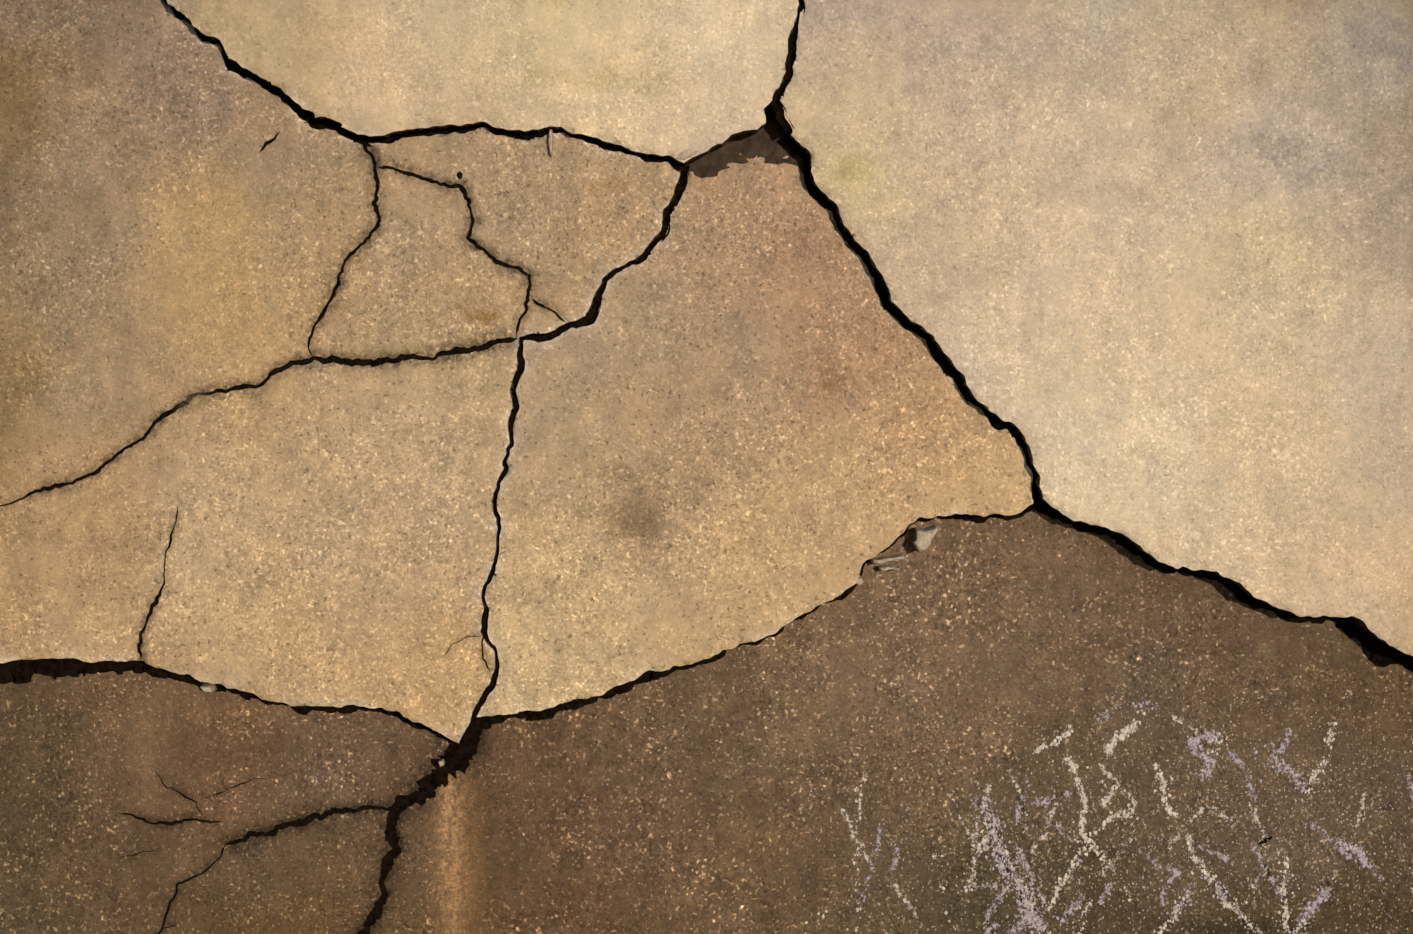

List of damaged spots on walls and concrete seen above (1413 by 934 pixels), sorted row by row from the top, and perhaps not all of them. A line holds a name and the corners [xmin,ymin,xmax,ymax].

flaking render [200,683,217,692]
crack [0,0,858,934]
flaking render [856,524,939,585]
crack [771,0,1413,672]